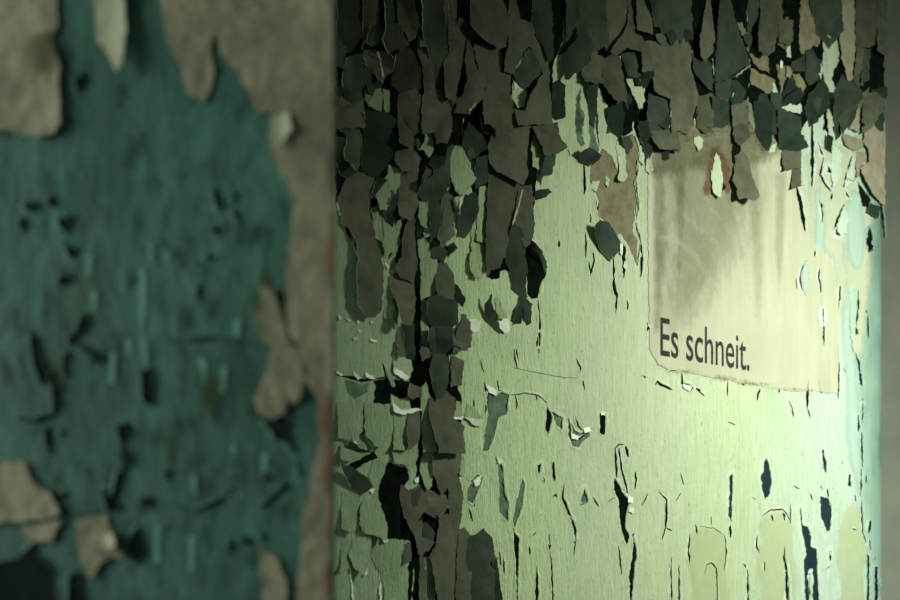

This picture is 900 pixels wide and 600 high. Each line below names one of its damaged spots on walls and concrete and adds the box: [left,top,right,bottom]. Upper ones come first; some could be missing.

peeling [0,0,61,138]
peeling [94,0,127,73]
peeling [15,192,78,260]
water stain [653,124,779,299]
rust [704,150,731,196]
peeling [161,0,334,600]
peeling [335,0,888,600]
peeling [15,330,71,457]
peeling [138,365,157,407]
peeling [0,421,148,600]